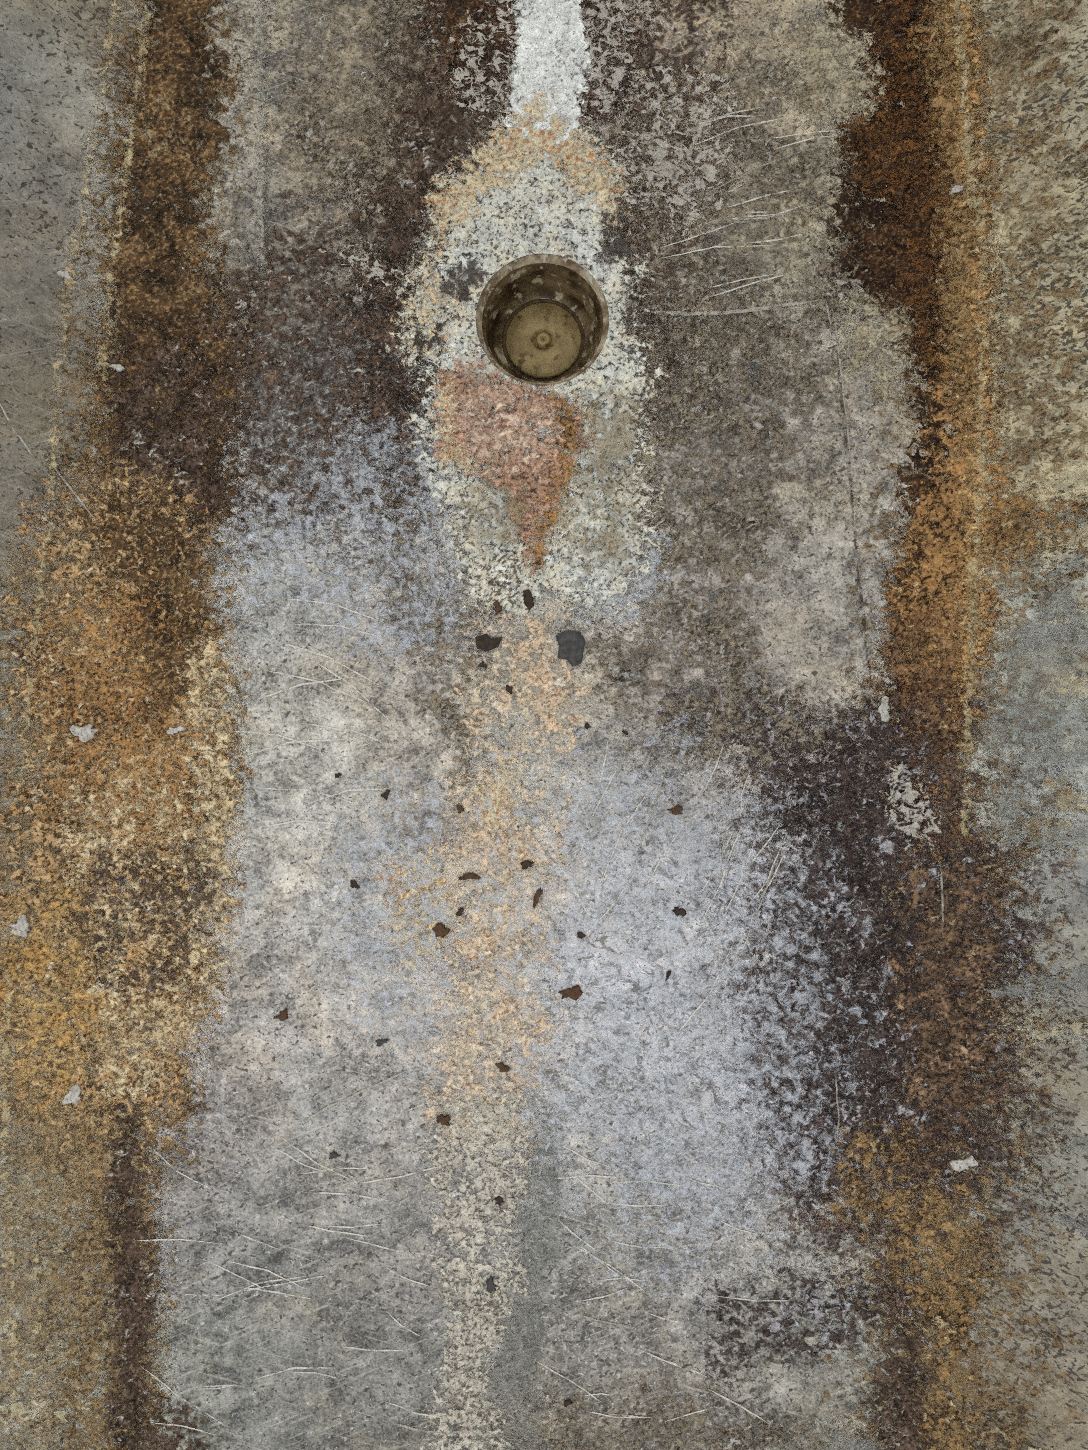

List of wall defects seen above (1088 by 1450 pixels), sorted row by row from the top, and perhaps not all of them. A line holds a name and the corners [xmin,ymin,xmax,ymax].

leakage [223,0,832,1450]
corrosion [516,0,1088,1450]